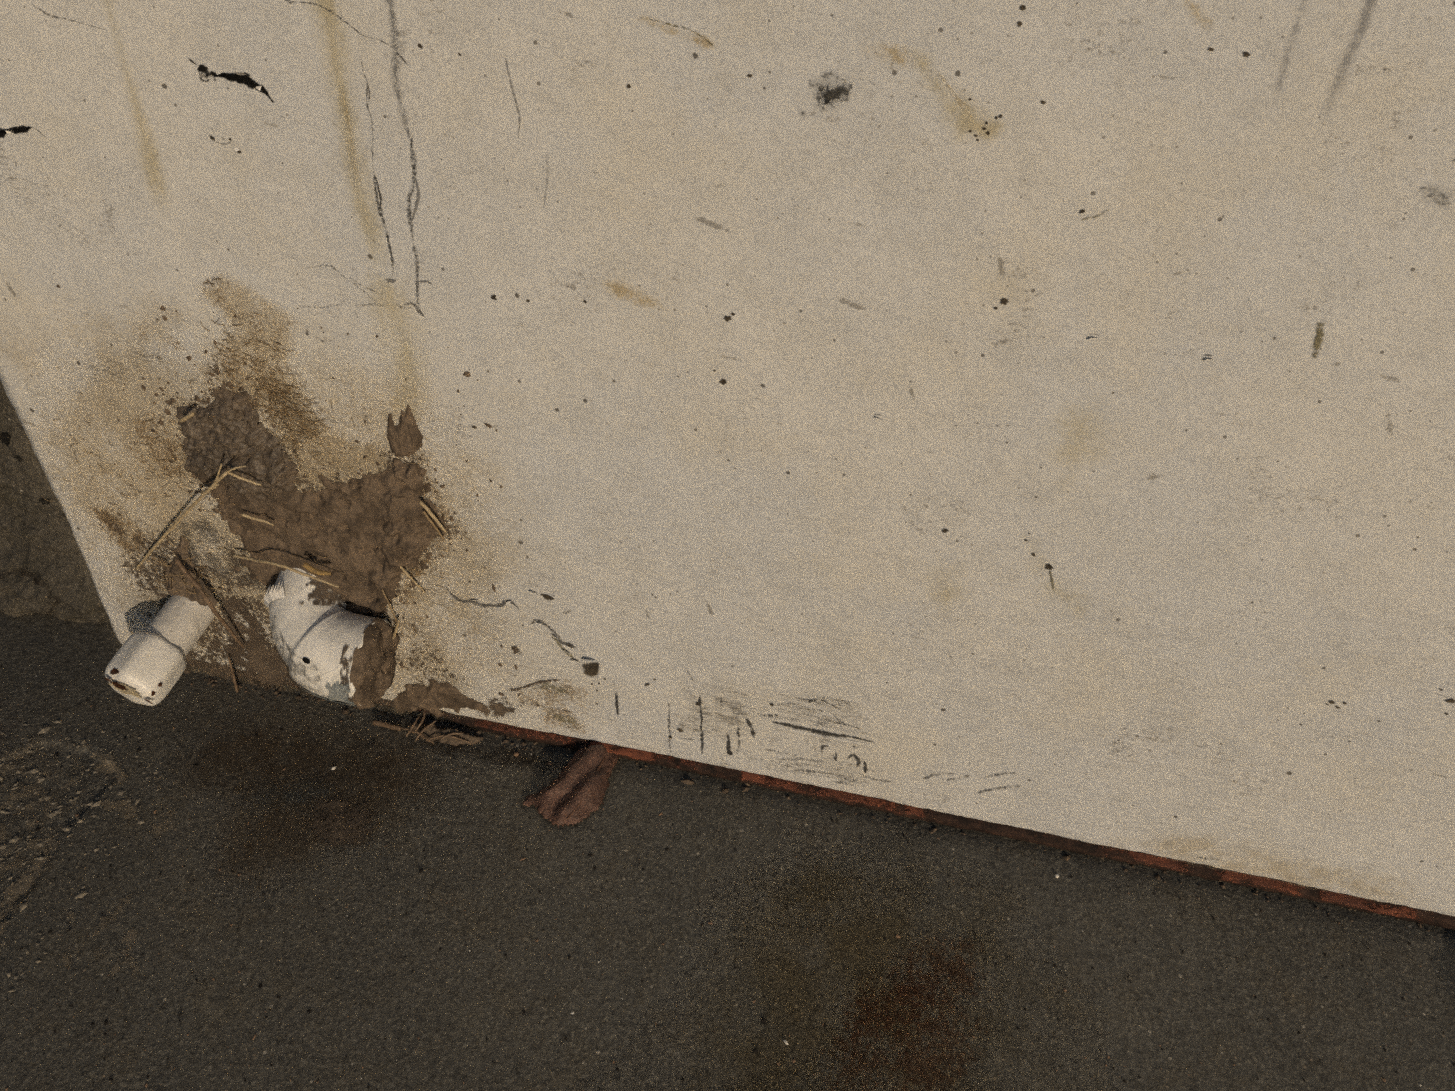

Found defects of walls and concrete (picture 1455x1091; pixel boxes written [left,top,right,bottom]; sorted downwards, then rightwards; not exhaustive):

corrosion [475,719,697,770]
corrosion [741,771,925,817]
corrosion [1106,848,1188,872]
corrosion [1217,869,1417,919]